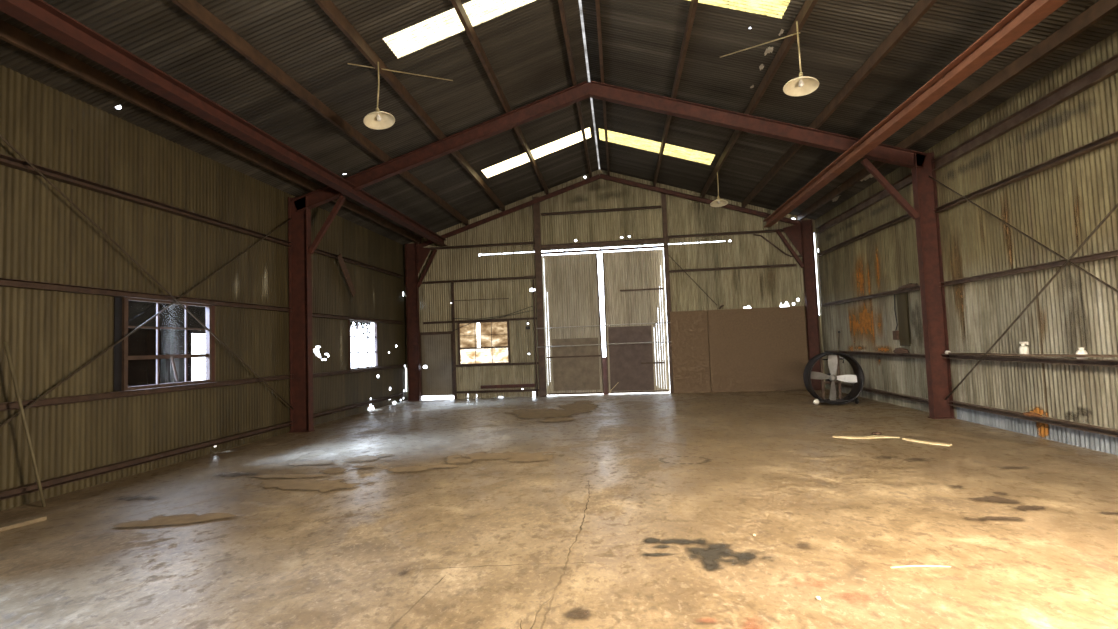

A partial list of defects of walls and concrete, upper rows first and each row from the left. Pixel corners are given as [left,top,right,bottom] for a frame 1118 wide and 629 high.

corrosion [849,248,889,363]
corrosion [1023,407,1049,438]
crack [520,492,589,629]